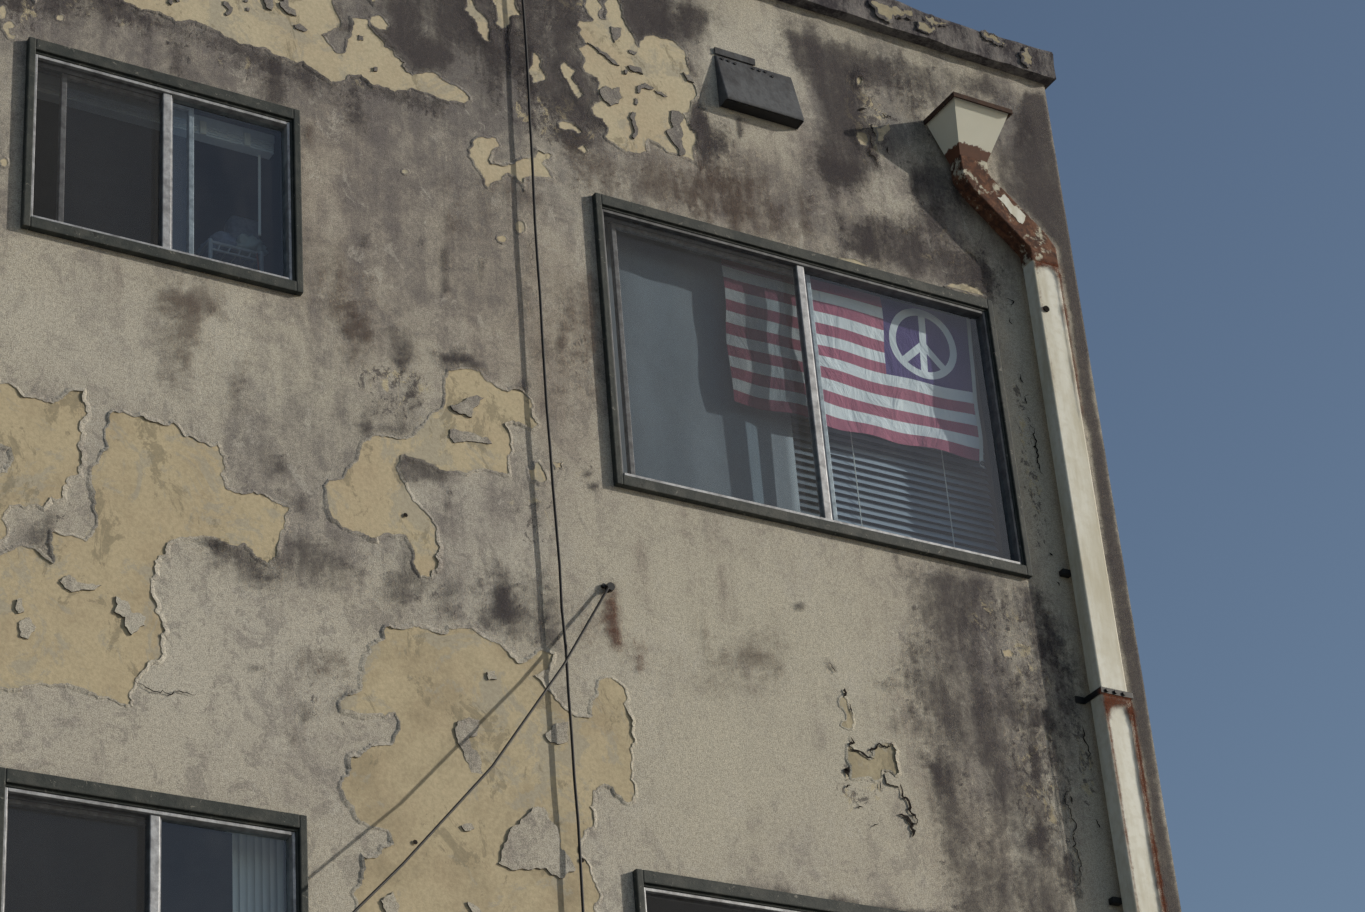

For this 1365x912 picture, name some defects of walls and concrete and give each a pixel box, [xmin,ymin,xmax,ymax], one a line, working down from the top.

peeling [116,0,473,108]
peeling [465,0,523,42]
peeling [467,134,557,193]
peeling [529,0,700,163]
water stain [779,26,997,195]
water stain [839,161,1002,298]
peeling [0,377,293,708]
peeling [322,367,563,579]
peeling [336,621,638,912]
crack [830,663,918,837]
water stain [900,562,1076,912]
rust [1103,693,1167,912]